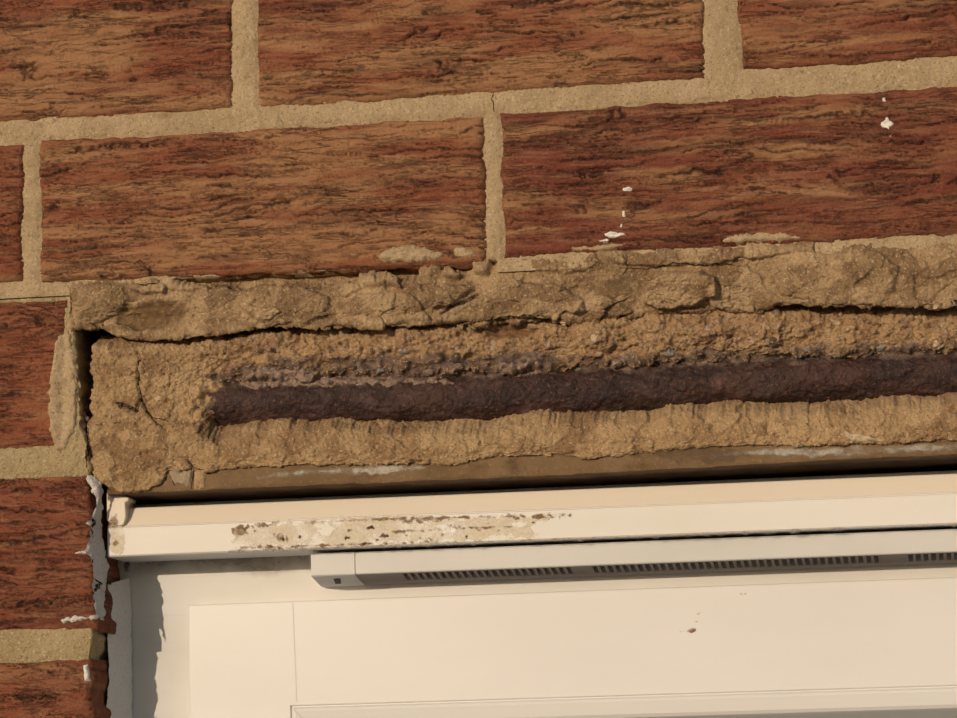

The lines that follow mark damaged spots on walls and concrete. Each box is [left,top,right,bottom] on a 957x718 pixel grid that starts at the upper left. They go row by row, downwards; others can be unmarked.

crack [116,354,167,430]
spalling [87,304,957,493]